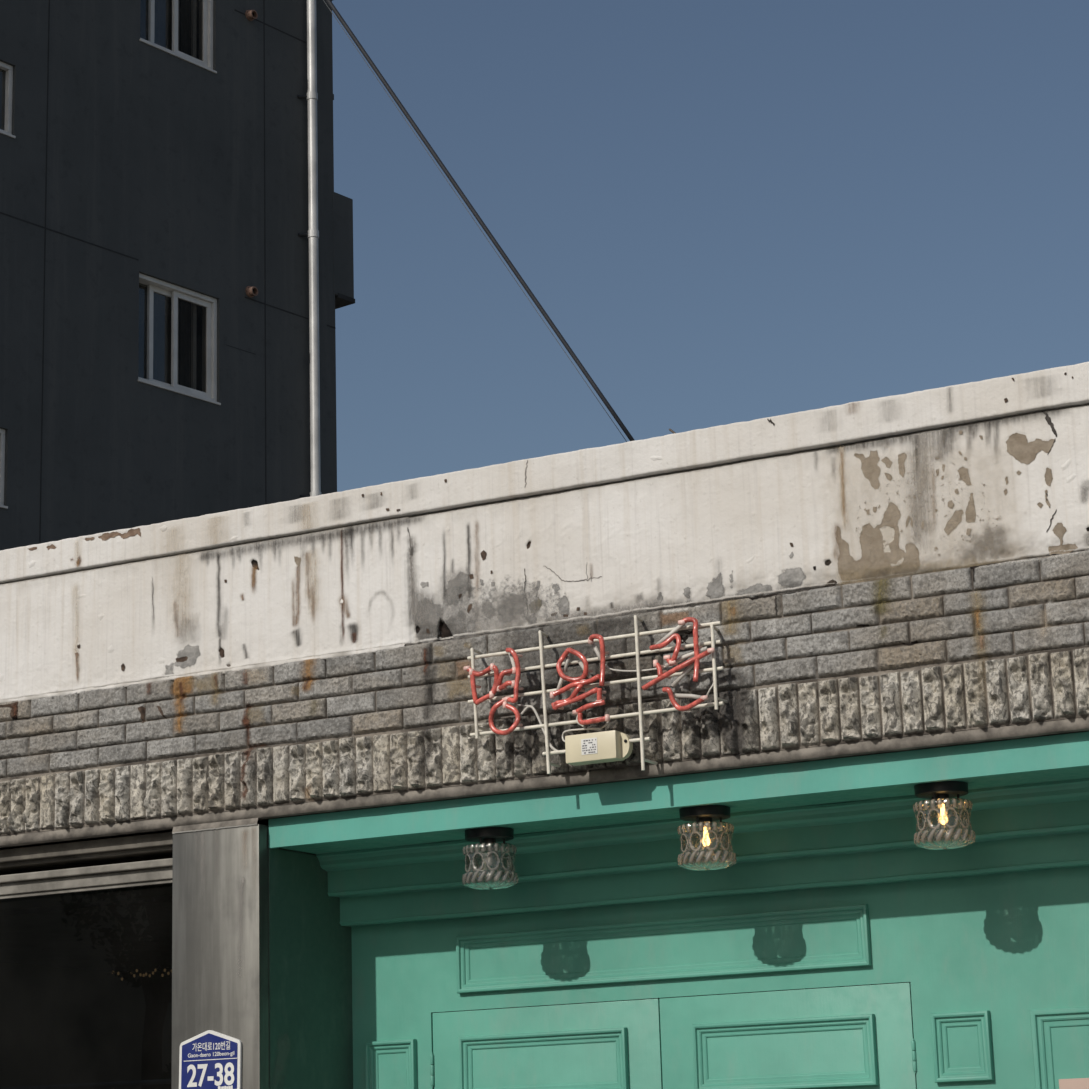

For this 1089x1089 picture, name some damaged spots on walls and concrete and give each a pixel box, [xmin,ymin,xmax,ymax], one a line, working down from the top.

peeling [1003,433,1054,495]
peeling [1037,468,1053,508]
peeling [85,528,141,541]
peeling [825,450,1001,587]
damp [409,526,806,774]
crack [0,702,18,721]
corrosion [173,676,192,731]